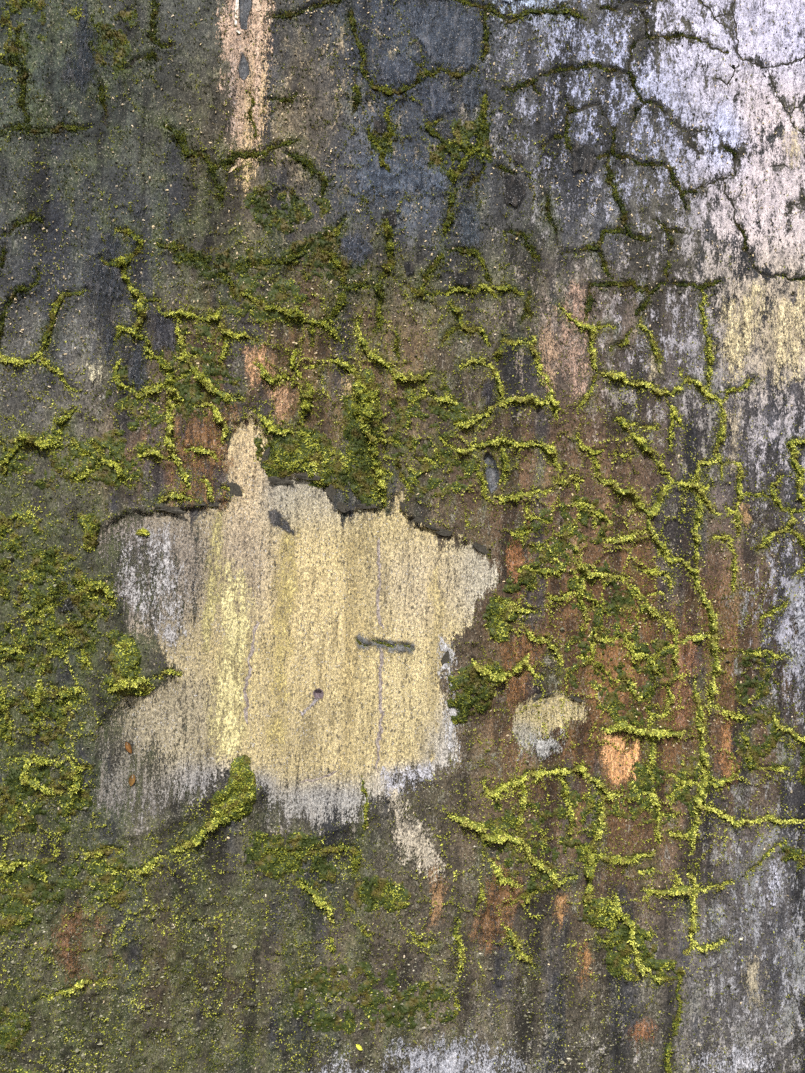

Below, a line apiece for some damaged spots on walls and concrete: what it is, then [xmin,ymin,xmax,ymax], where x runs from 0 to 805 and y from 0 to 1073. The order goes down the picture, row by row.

crack [270,0,587,173]
peeling [460,103,642,309]
peeling [590,36,791,268]
peeling [0,221,101,404]
crack [99,92,584,528]
peeling [87,0,515,845]
peeling [501,637,602,767]
peeling [544,527,717,719]
damp [300,1032,539,1073]